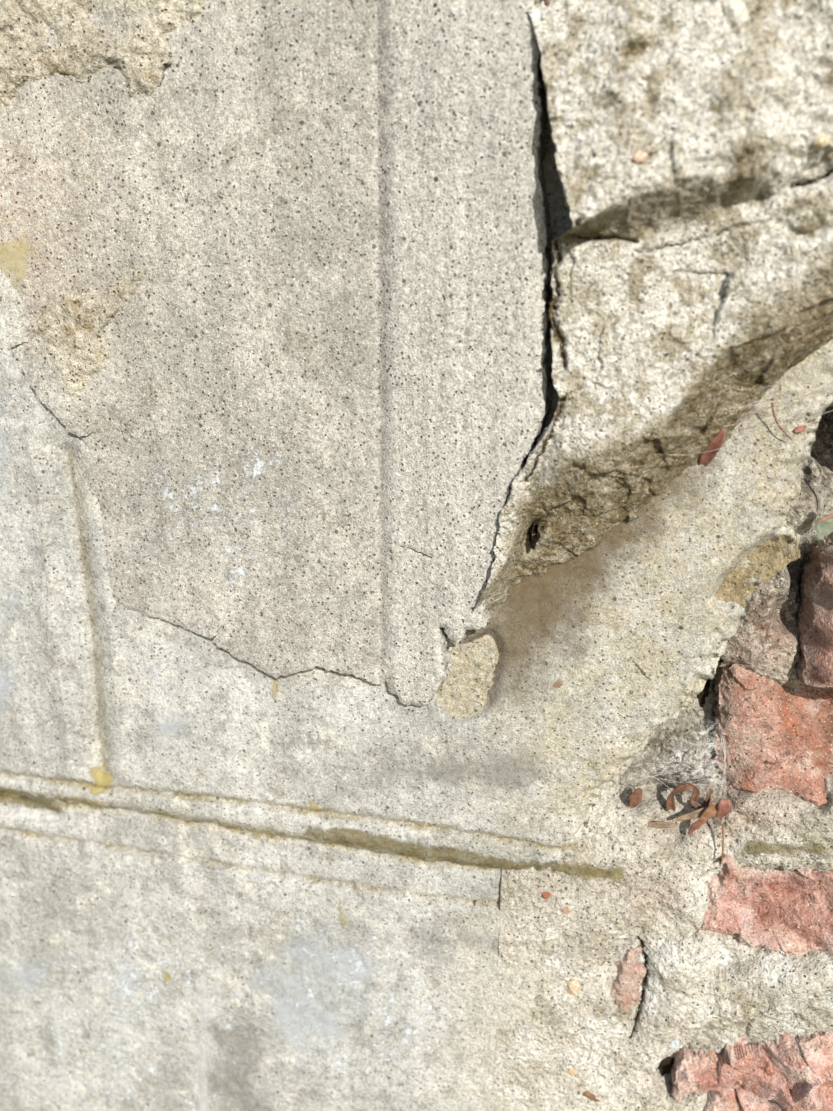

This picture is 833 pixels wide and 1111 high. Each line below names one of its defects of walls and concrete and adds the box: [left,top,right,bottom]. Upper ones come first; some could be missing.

spalling [0,0,213,107]
crack [790,169,833,188]
spalling [0,261,154,437]
crack [548,222,750,369]
spalling [472,0,833,612]
crack [524,398,564,481]
spalling [494,402,833,1111]